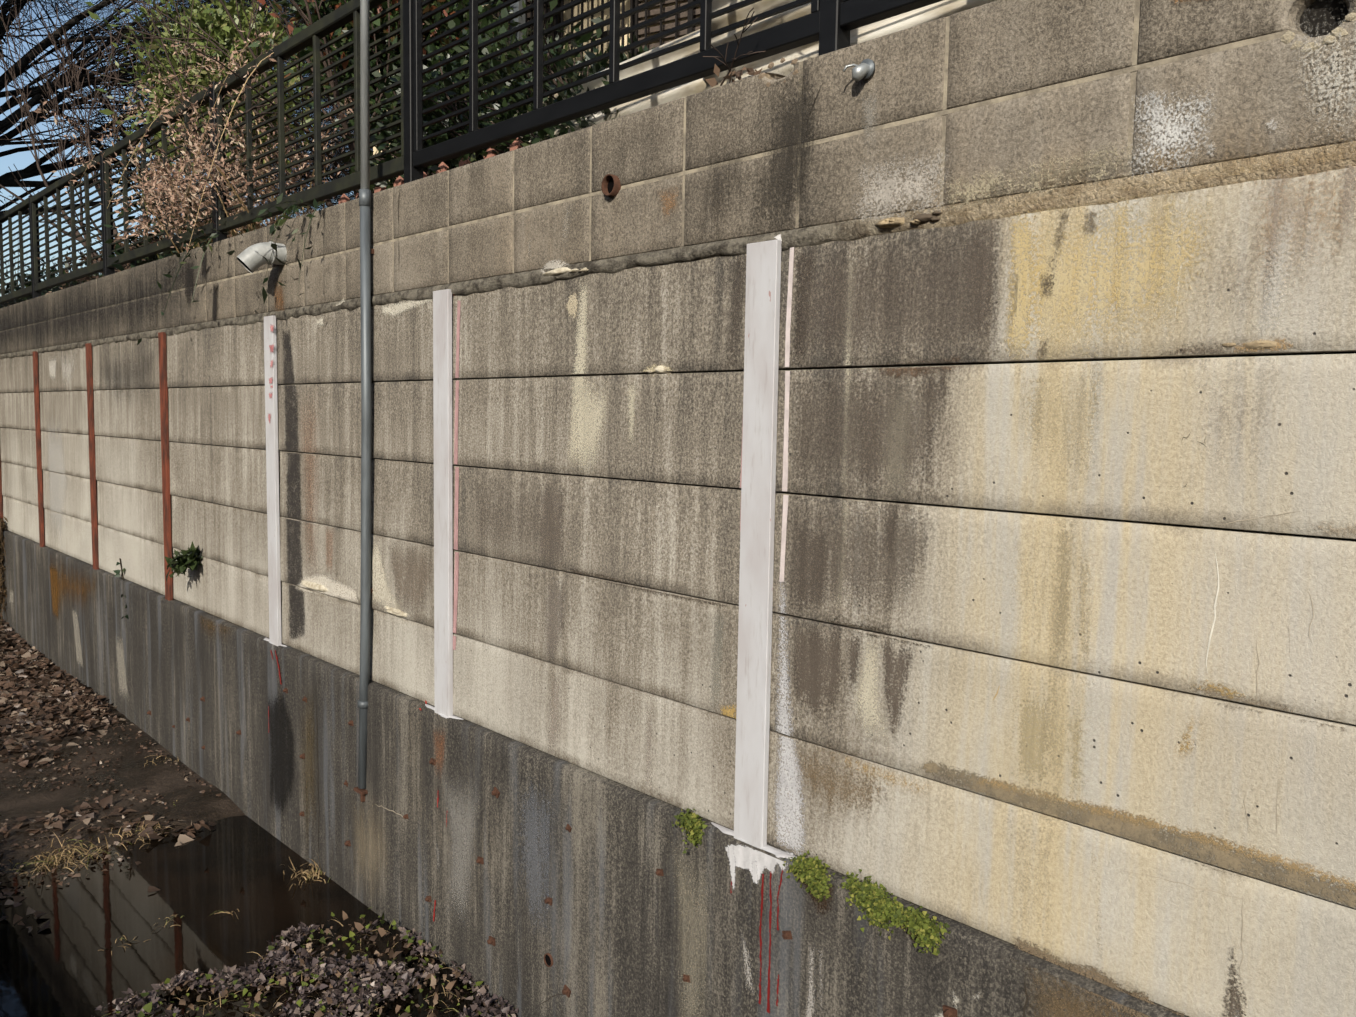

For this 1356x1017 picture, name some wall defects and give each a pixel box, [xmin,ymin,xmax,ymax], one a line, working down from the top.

hole [1281,12,1356,52]
crack [1206,511,1300,667]
leakage [828,620,933,731]
leakage [268,696,295,811]
leakage [436,784,478,913]
leakage [800,755,1356,908]
leakage [676,862,706,1017]